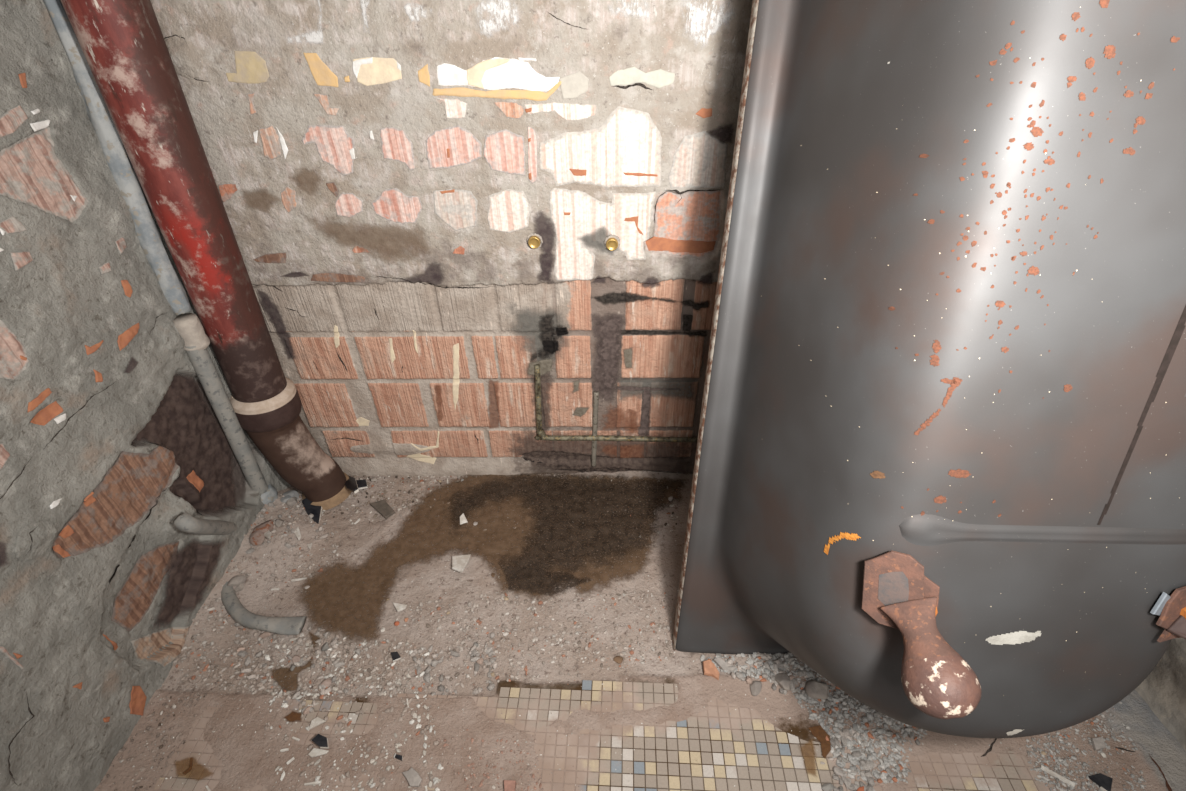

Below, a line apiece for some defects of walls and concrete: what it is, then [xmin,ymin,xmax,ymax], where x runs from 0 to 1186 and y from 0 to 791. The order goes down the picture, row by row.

flaking render [253,126,288,160]
flaking render [301,57,727,281]
flaking render [253,252,287,263]
spalling [311,272,366,283]
leakage [535,212,555,282]
leakage [583,228,613,253]
leakage [258,291,295,359]
flaking render [28,388,66,426]
spalling [52,444,179,558]
leakage [272,277,709,691]
spalling [111,541,190,667]
flaking render [129,686,147,716]